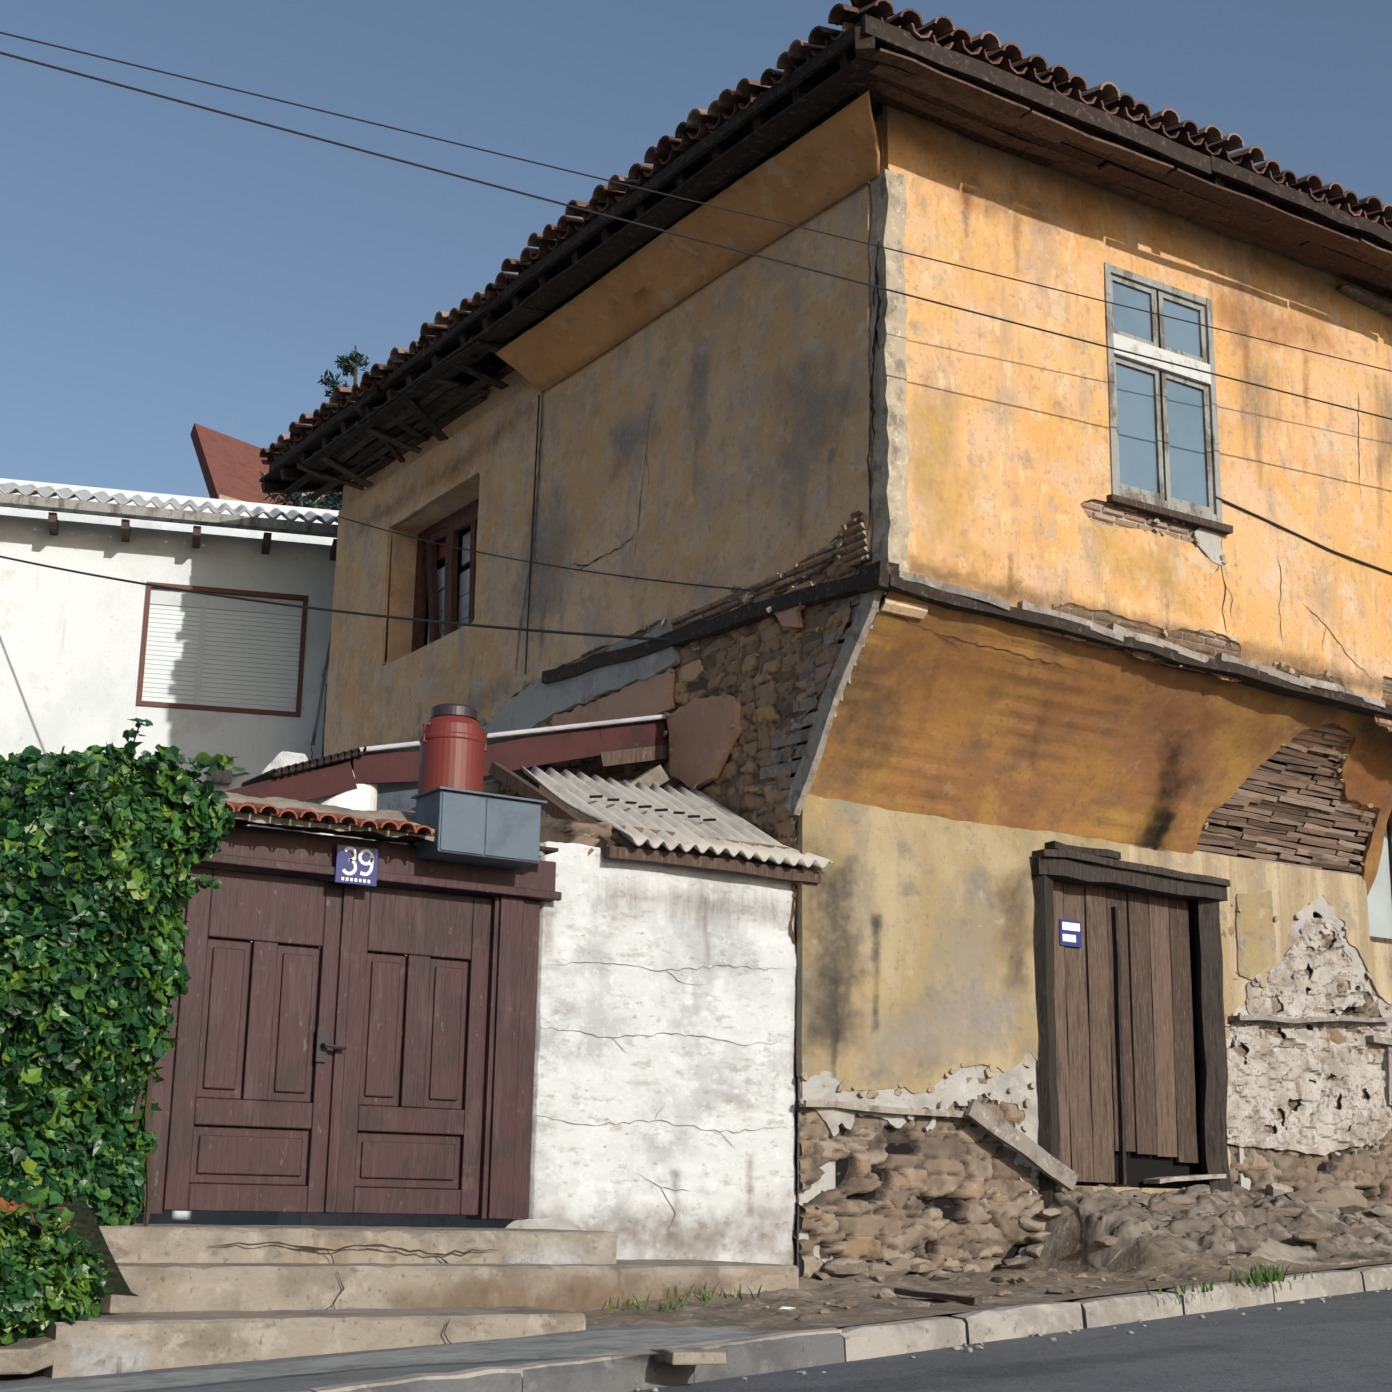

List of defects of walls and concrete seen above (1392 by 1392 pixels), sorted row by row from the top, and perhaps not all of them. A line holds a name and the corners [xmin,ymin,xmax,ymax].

crack [867,241,882,535]
crack [572,411,651,572]
peeling [1080,500,1227,566]
peeling [479,510,872,792]
damp [1153,814,1172,850]
peeling [1195,723,1377,876]
crack [534,1102,786,1146]
crack [539,1026,782,1054]
crack [550,962,787,985]
damp [811,870,853,1052]
peeling [799,1053,1039,1144]
peeling [1225,890,1392,1190]